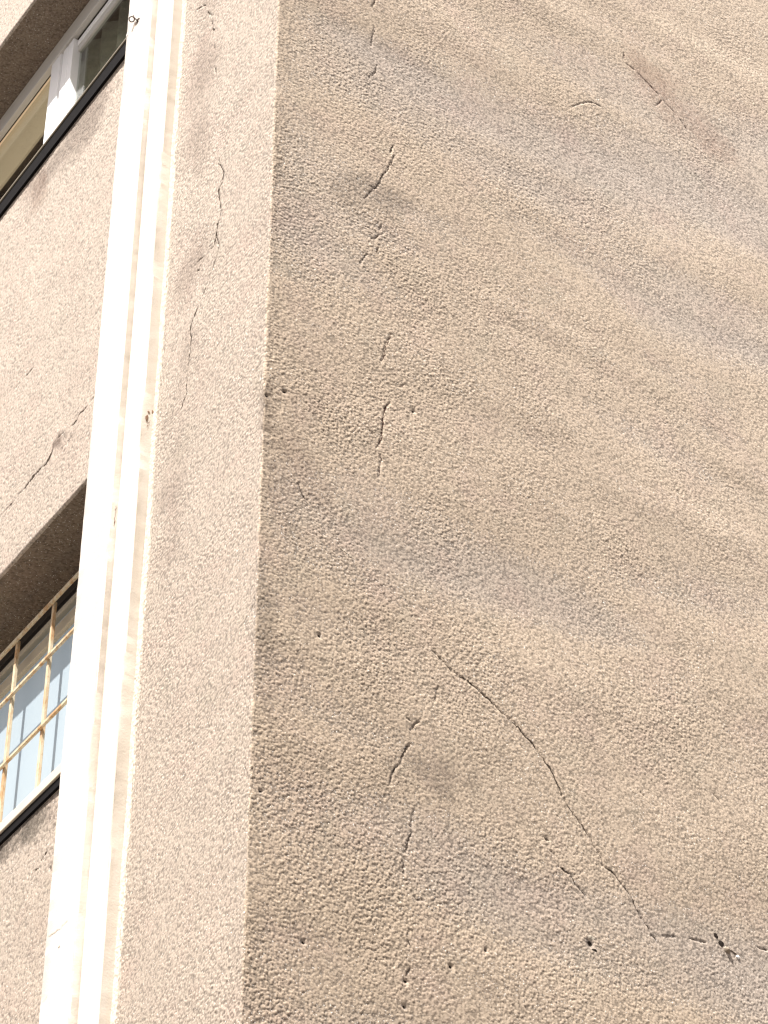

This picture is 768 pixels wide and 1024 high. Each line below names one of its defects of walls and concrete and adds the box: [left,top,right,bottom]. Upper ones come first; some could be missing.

crack [6,407,86,510]
crack [376,404,389,475]
crack [437,655,706,943]